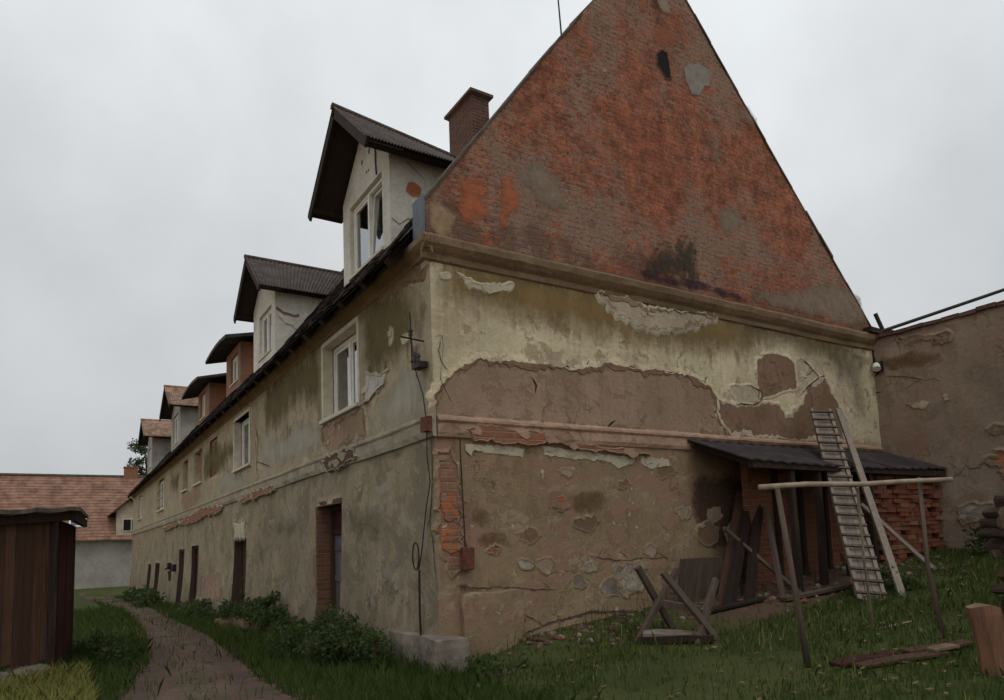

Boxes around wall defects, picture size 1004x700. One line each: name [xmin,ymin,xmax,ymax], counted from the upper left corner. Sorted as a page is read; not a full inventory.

flaking render [376,264,515,304]
leakage [453,266,857,385]
flaking render [595,290,718,337]
leakage [643,239,746,302]
flaking render [320,368,389,473]
flaking render [425,350,849,581]
flaking render [162,484,224,532]
flaking render [232,485,277,542]
crack [427,448,437,583]
flaking render [955,500,995,528]
crack [466,584,556,592]
crack [525,550,668,636]